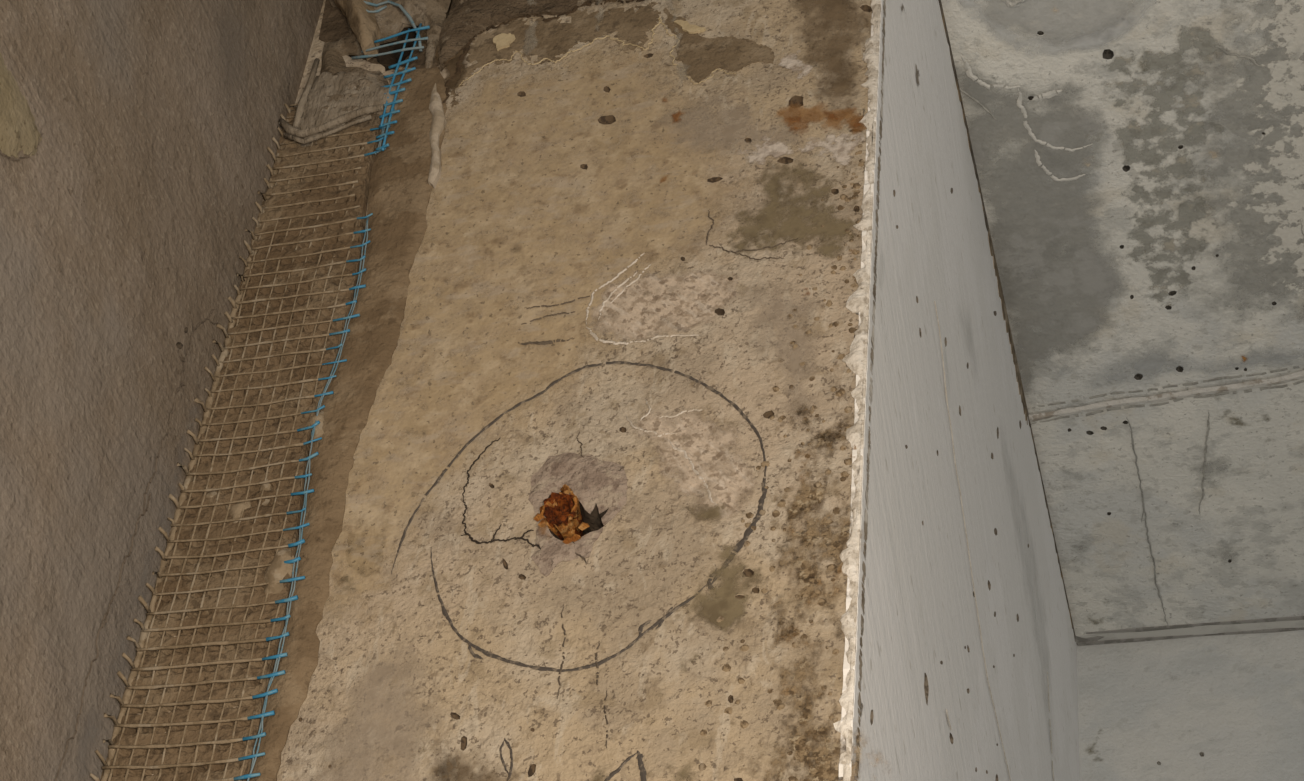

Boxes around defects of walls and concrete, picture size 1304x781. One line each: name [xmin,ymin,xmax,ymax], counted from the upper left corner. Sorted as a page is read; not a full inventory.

peeling [278,0,775,189]
crack [441,0,645,103]
spalling [789,95,803,108]
corrosion [778,106,865,133]
damp [957,0,1304,391]
crack [856,0,886,776]
crack [55,309,218,781]
crack [461,438,587,565]
corrosion [533,484,589,544]